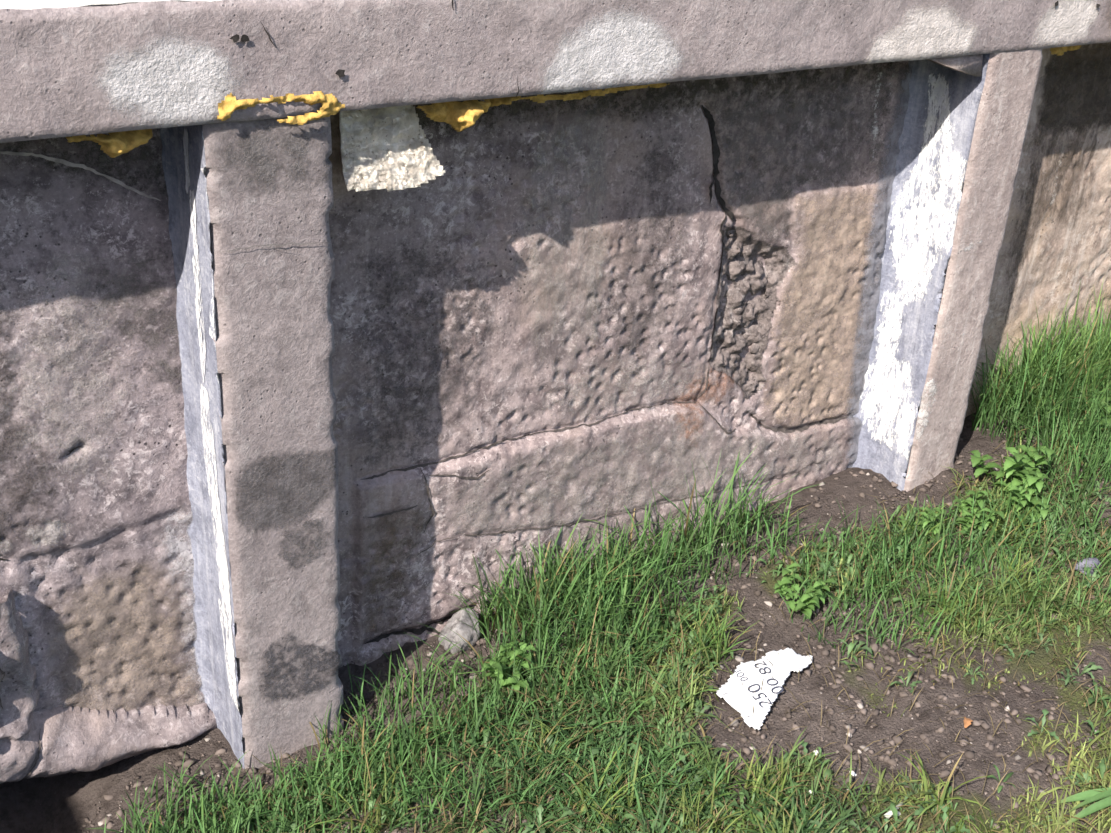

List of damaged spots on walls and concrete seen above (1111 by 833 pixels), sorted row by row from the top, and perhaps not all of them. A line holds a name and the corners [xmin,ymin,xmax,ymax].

crack [701,105,734,242]
flaking render [709,193,874,422]
damp [860,73,982,462]
damp [1005,0,1111,322]
crack [360,367,848,556]
crack [23,732,41,780]
damp [260,636,340,700]